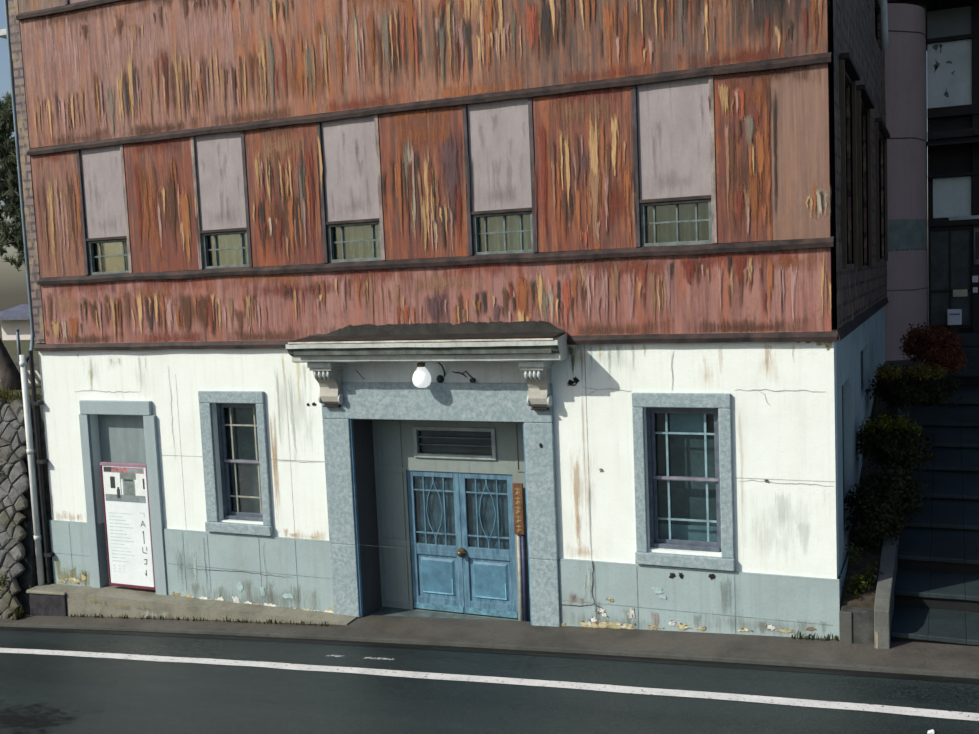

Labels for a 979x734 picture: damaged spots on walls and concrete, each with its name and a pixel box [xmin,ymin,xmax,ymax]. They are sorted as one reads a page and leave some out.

rust [34,0,822,343]
rust [806,186,827,218]
rust [812,254,831,317]
crack [737,389,822,402]
crack [747,479,823,487]
crack [560,561,602,608]
spalling [578,598,635,629]
spalling [647,620,706,631]